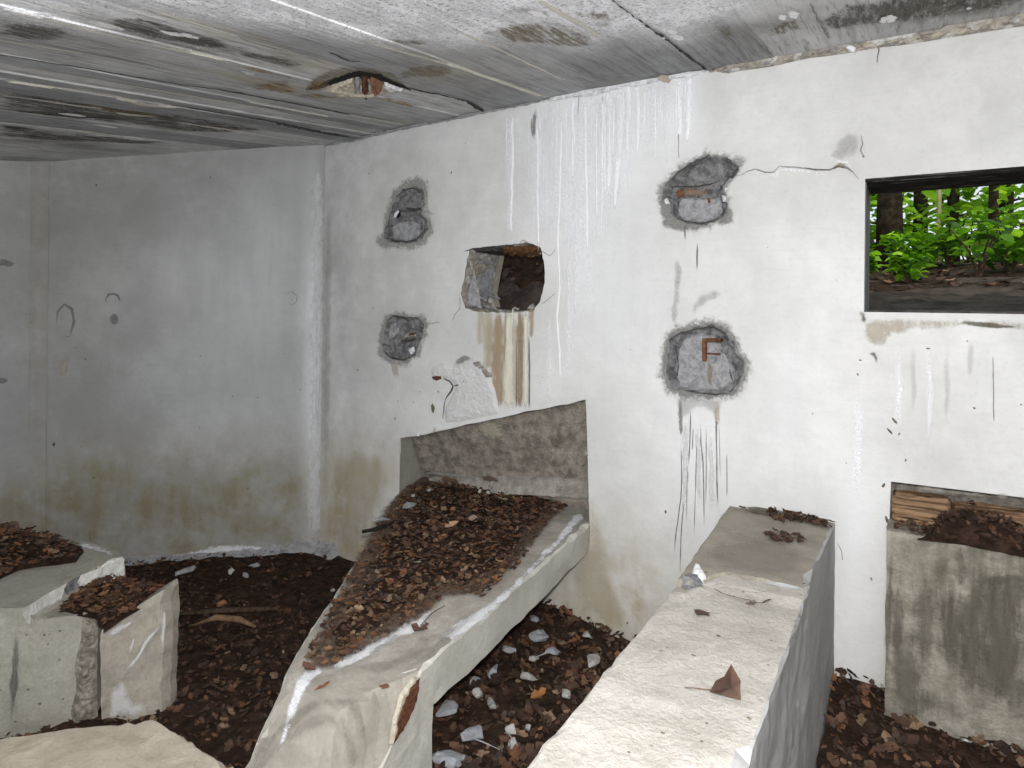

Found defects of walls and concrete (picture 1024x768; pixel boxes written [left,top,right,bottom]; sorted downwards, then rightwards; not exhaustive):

water stain [0,1,237,60]
water stain [459,1,607,79]
water stain [0,67,328,151]
spalling [303,68,413,107]
spalling [378,179,433,249]
water stain [368,40,709,394]
spalling [657,153,744,236]
crack [738,135,865,179]
spalling [379,240,555,374]
corrosion [487,309,533,405]
spalling [659,321,750,399]
water stain [675,403,727,563]